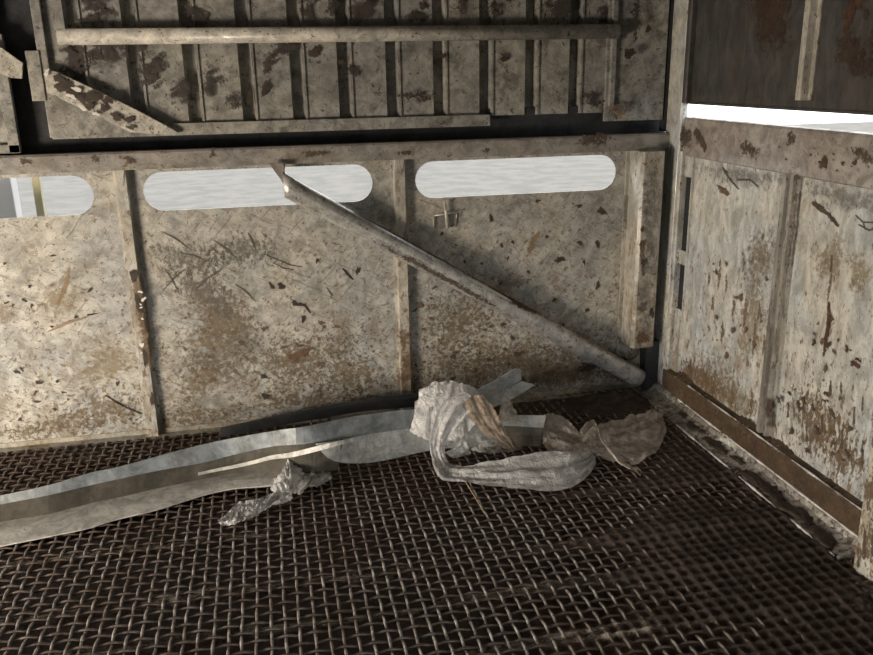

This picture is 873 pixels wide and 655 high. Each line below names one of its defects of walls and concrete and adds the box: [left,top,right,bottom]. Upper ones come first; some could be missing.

rust [73,0,117,28]
rust [296,0,383,23]
rust [59,42,320,110]
rust [387,89,435,104]
rust [130,270,151,369]
rust [150,200,603,426]
rust [811,240,869,403]
rust [667,236,860,532]
rust [0,421,60,444]